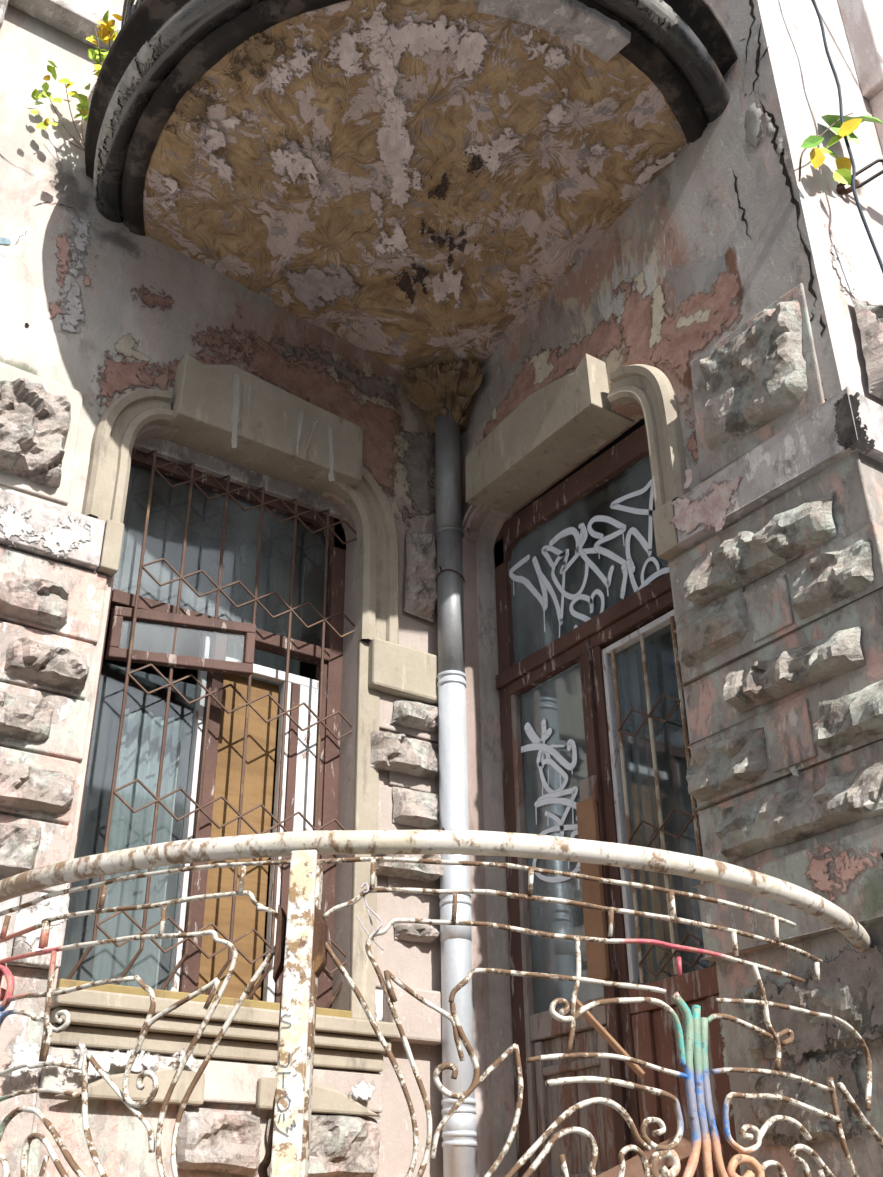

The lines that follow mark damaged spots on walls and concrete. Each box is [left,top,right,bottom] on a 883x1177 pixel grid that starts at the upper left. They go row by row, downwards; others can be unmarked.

peeling [93,35,166,201]
peeling [155,173,188,215]
peeling [162,1,530,315]
peeling [519,25,574,132]
crack [733,172,752,240]
crack [739,0,826,337]
peeling [48,214,98,334]
peeling [130,284,174,313]
peeling [482,267,743,534]
peeling [805,844,881,902]